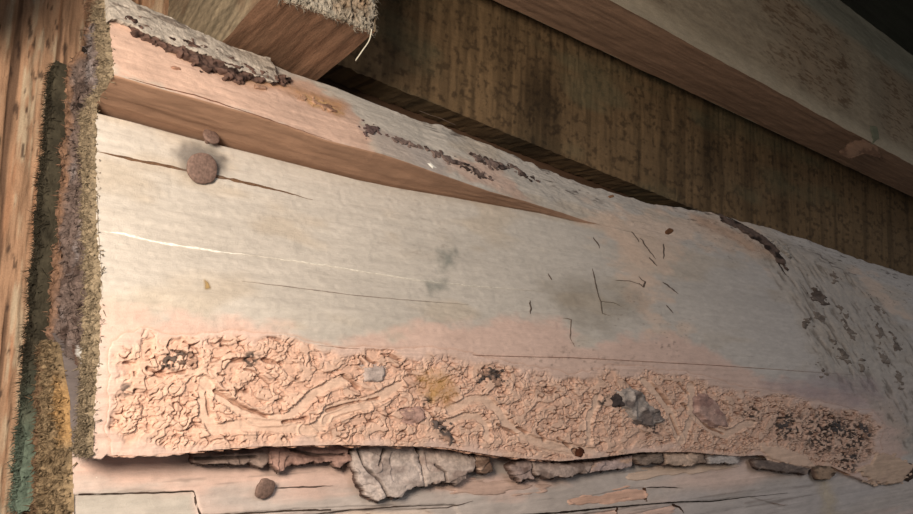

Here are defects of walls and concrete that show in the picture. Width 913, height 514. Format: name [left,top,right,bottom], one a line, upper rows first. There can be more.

crack [97,151,187,172]
crack [216,175,312,200]
peeling [752,442,816,468]
peeling [856,449,913,487]
crack [78,490,201,514]
crack [225,486,471,514]
crack [533,486,784,514]